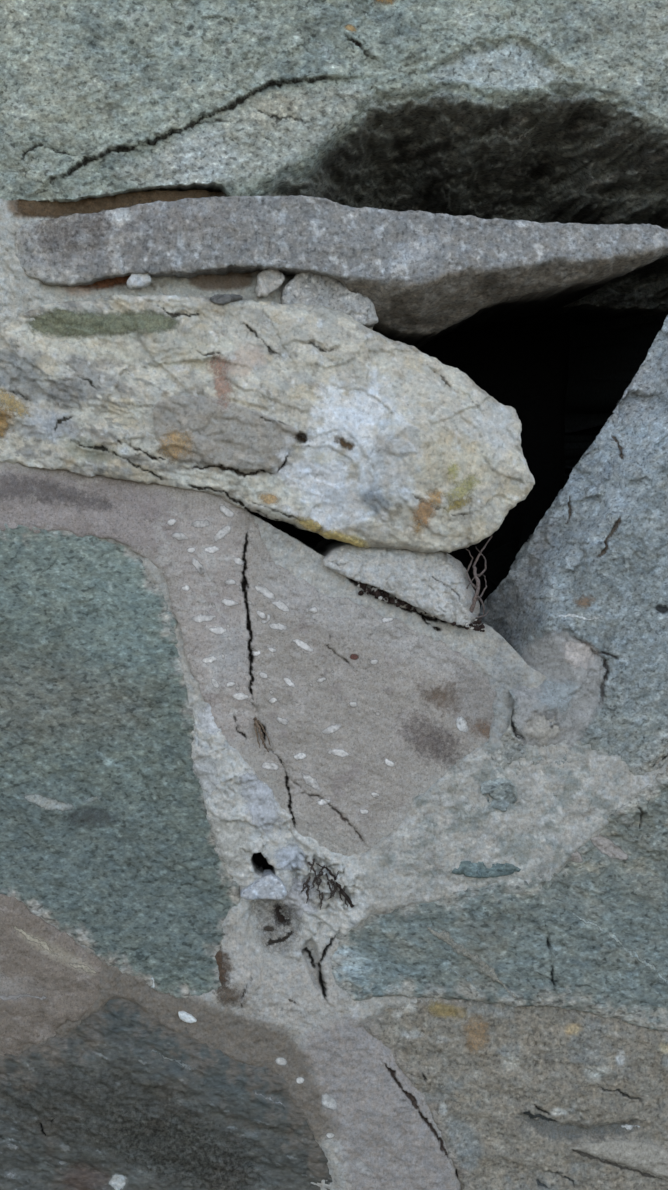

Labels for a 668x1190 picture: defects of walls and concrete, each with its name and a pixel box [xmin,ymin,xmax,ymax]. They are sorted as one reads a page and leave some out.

crack [55,417,165,480]
crack [190,456,301,694]
crack [234,717,362,839]